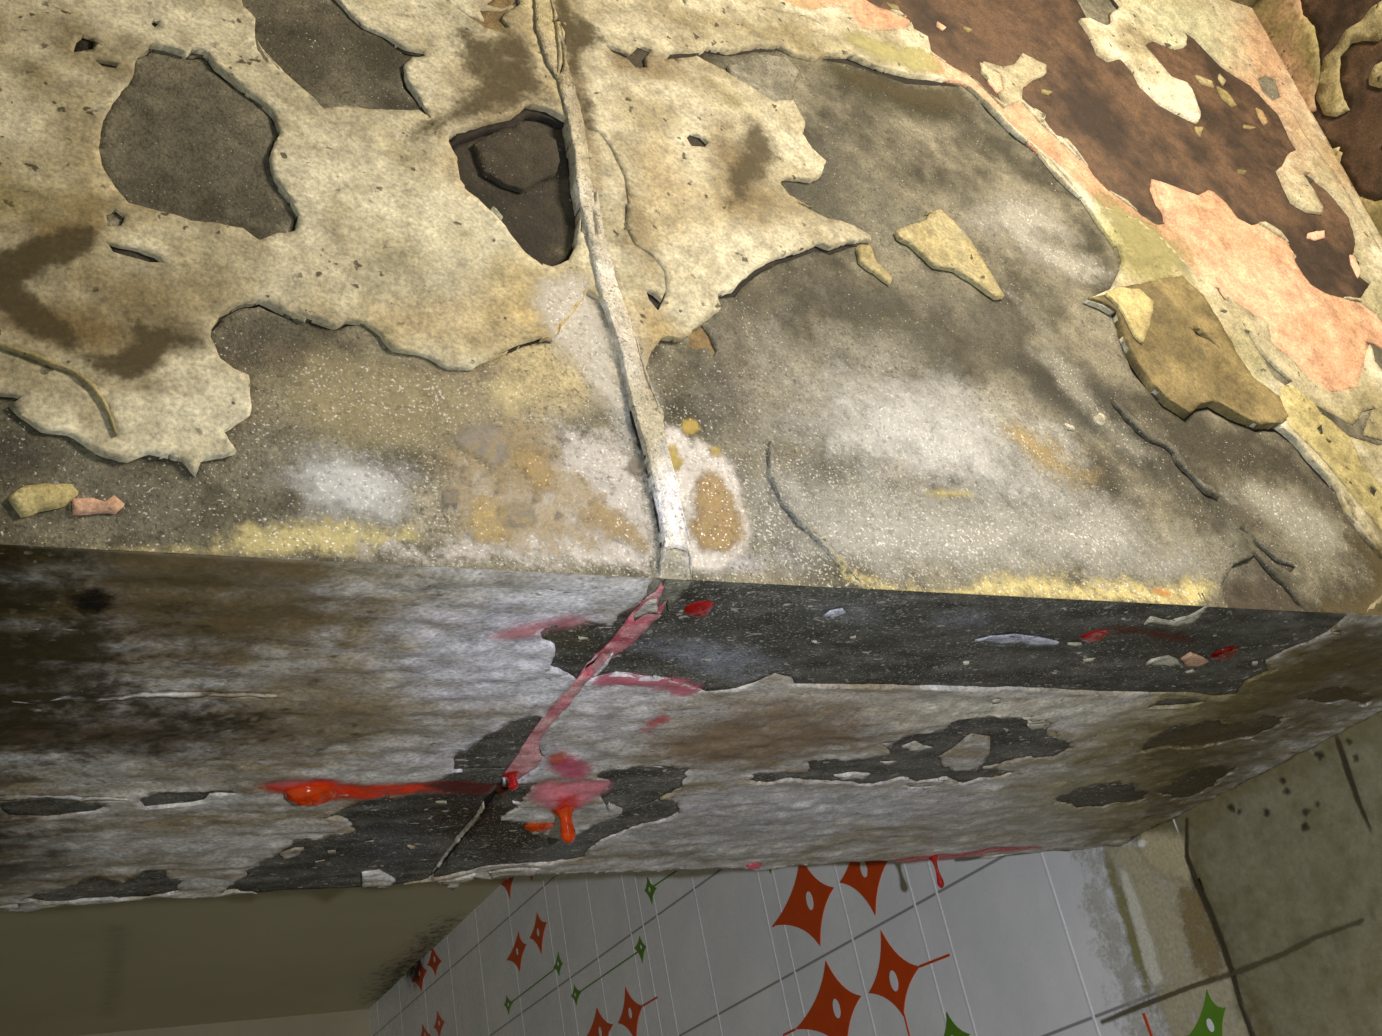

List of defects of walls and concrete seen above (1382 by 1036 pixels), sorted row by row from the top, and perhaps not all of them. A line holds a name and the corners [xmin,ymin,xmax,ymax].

peeling [0,0,1382,787]
crack [430,0,693,876]
leakage [663,419,751,572]
leakage [0,357,663,763]
leakage [594,674,699,696]
peeling [0,797,104,816]
peeling [140,792,219,806]
leakage [267,779,507,800]
peeling [226,718,688,893]
leakage [531,752,609,810]
peeling [1056,766,1234,808]
peeling [0,871,182,910]